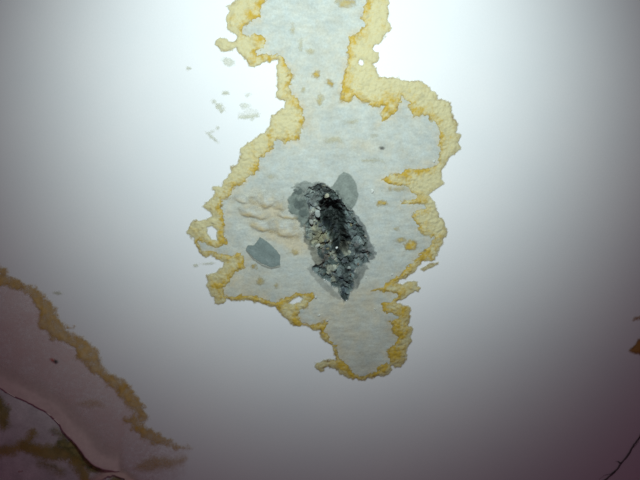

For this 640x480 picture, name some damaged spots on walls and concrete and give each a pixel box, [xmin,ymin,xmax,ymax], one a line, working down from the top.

flaking render [246,238,280,269]
leakage [187,0,461,380]
spalling [288,172,376,301]
leakage [0,268,180,480]